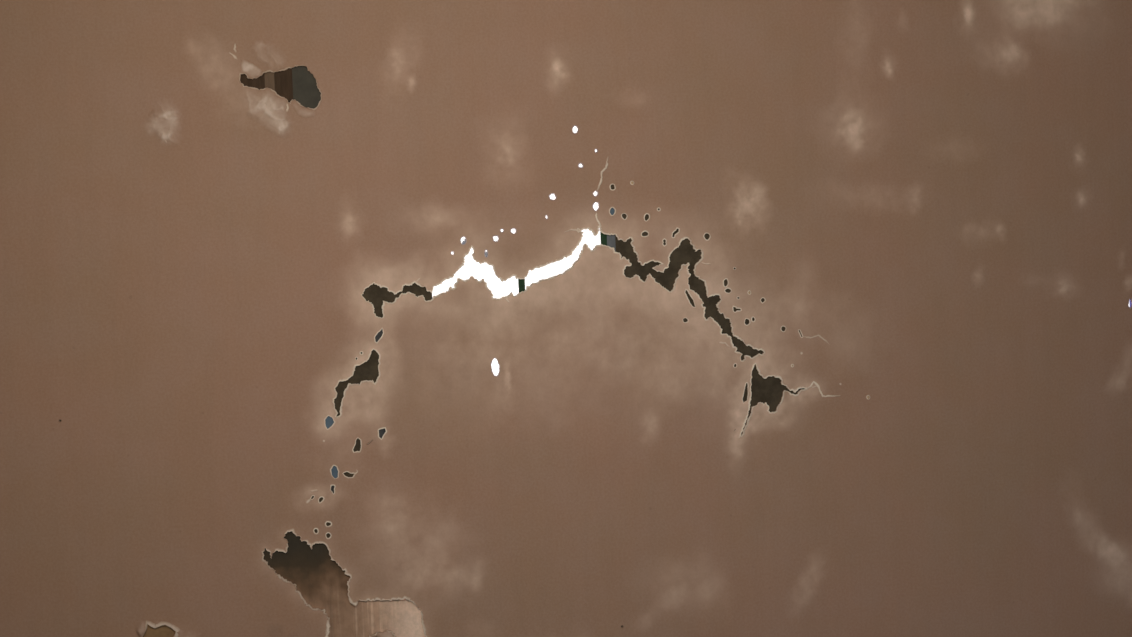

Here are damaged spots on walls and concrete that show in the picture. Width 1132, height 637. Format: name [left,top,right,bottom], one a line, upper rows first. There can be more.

peeling [239,39,316,139]
damp [244,0,1000,637]
spalling [323,330,383,442]
spalling [311,466,354,502]
peeling [134,620,202,637]